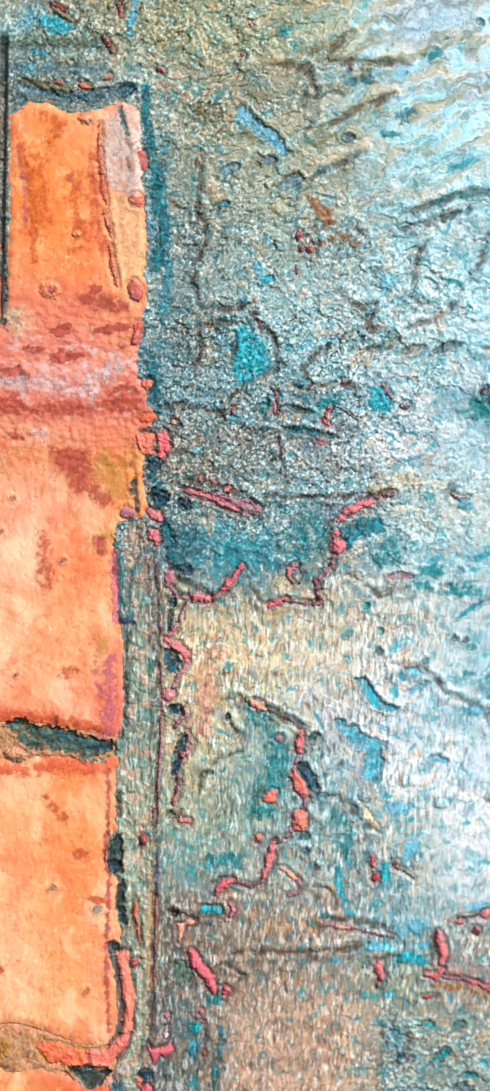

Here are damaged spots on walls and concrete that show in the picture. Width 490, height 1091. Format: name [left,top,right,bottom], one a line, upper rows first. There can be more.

spalling [1,35,147,302]
peeling [131,322,144,345]
peeling [136,414,176,469]
spalling [6,718,113,759]